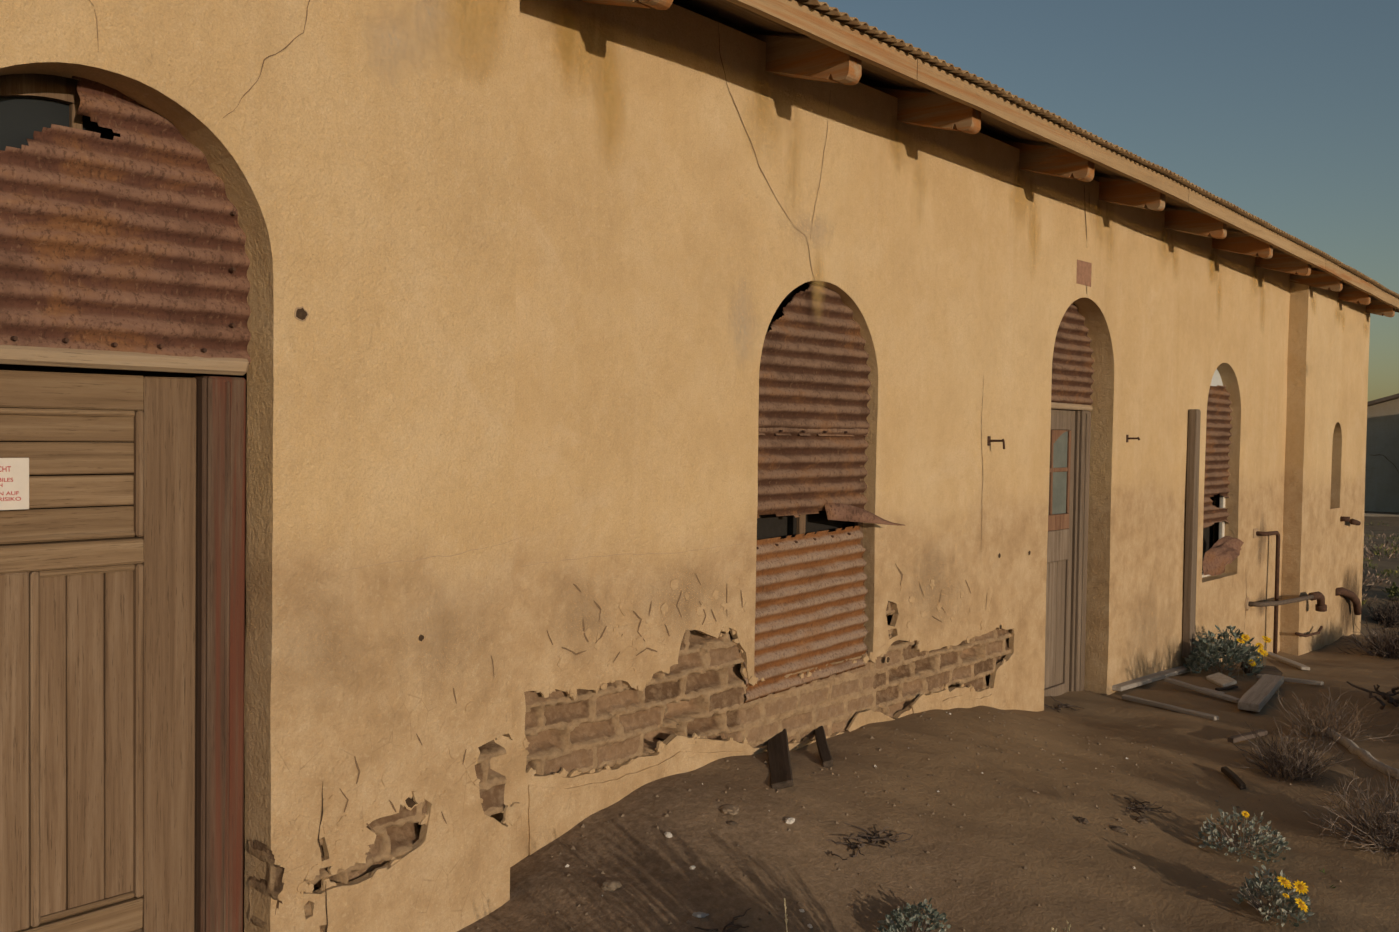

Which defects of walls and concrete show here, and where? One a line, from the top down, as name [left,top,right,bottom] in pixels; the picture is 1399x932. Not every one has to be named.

crack [223,0,310,118]
crack [717,9,831,280]
spalling [472,602,1015,855]
spalling [248,787,429,932]